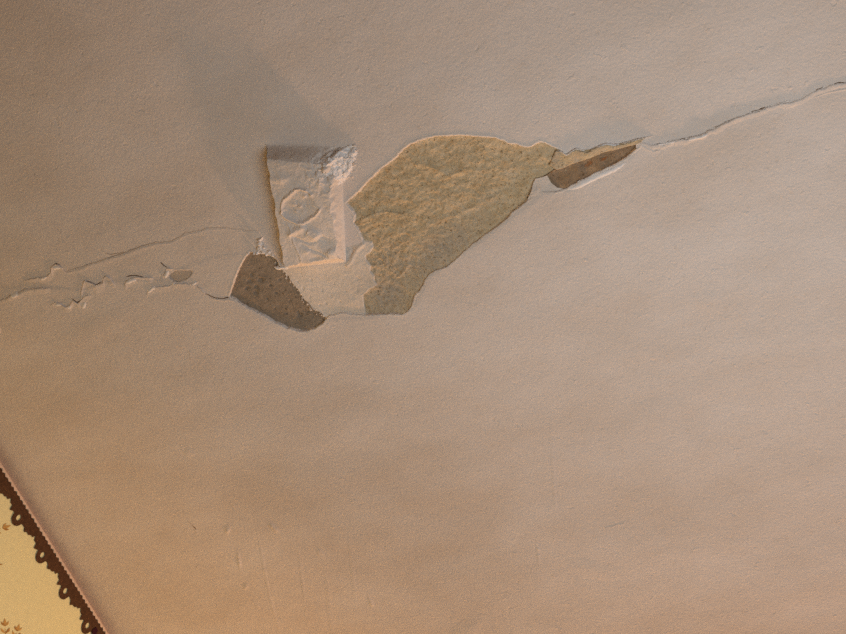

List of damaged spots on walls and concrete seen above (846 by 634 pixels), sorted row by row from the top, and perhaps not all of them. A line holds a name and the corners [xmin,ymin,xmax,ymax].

flaking render [228,133,651,334]
crack [547,82,846,194]